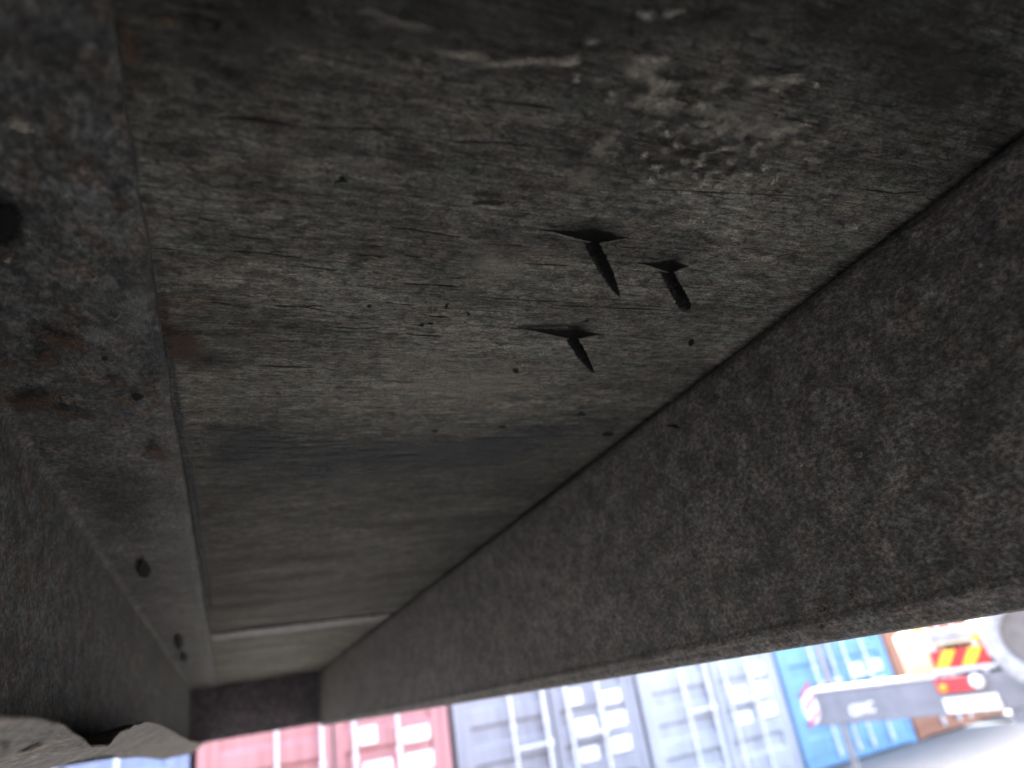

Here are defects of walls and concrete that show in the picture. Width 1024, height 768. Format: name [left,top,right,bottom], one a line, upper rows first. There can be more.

leakage [628,56,811,145]